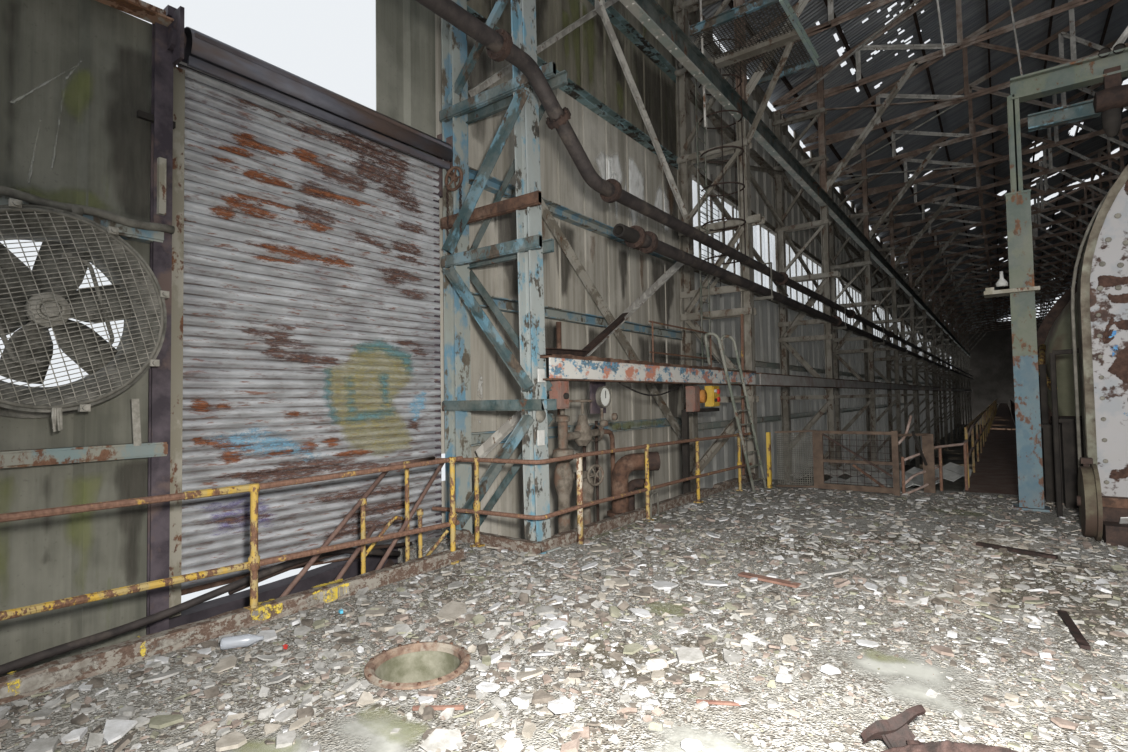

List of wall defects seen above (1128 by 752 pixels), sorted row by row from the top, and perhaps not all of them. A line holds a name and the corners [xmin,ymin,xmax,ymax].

corrosion [209,97,427,299]
corrosion [397,340,427,357]